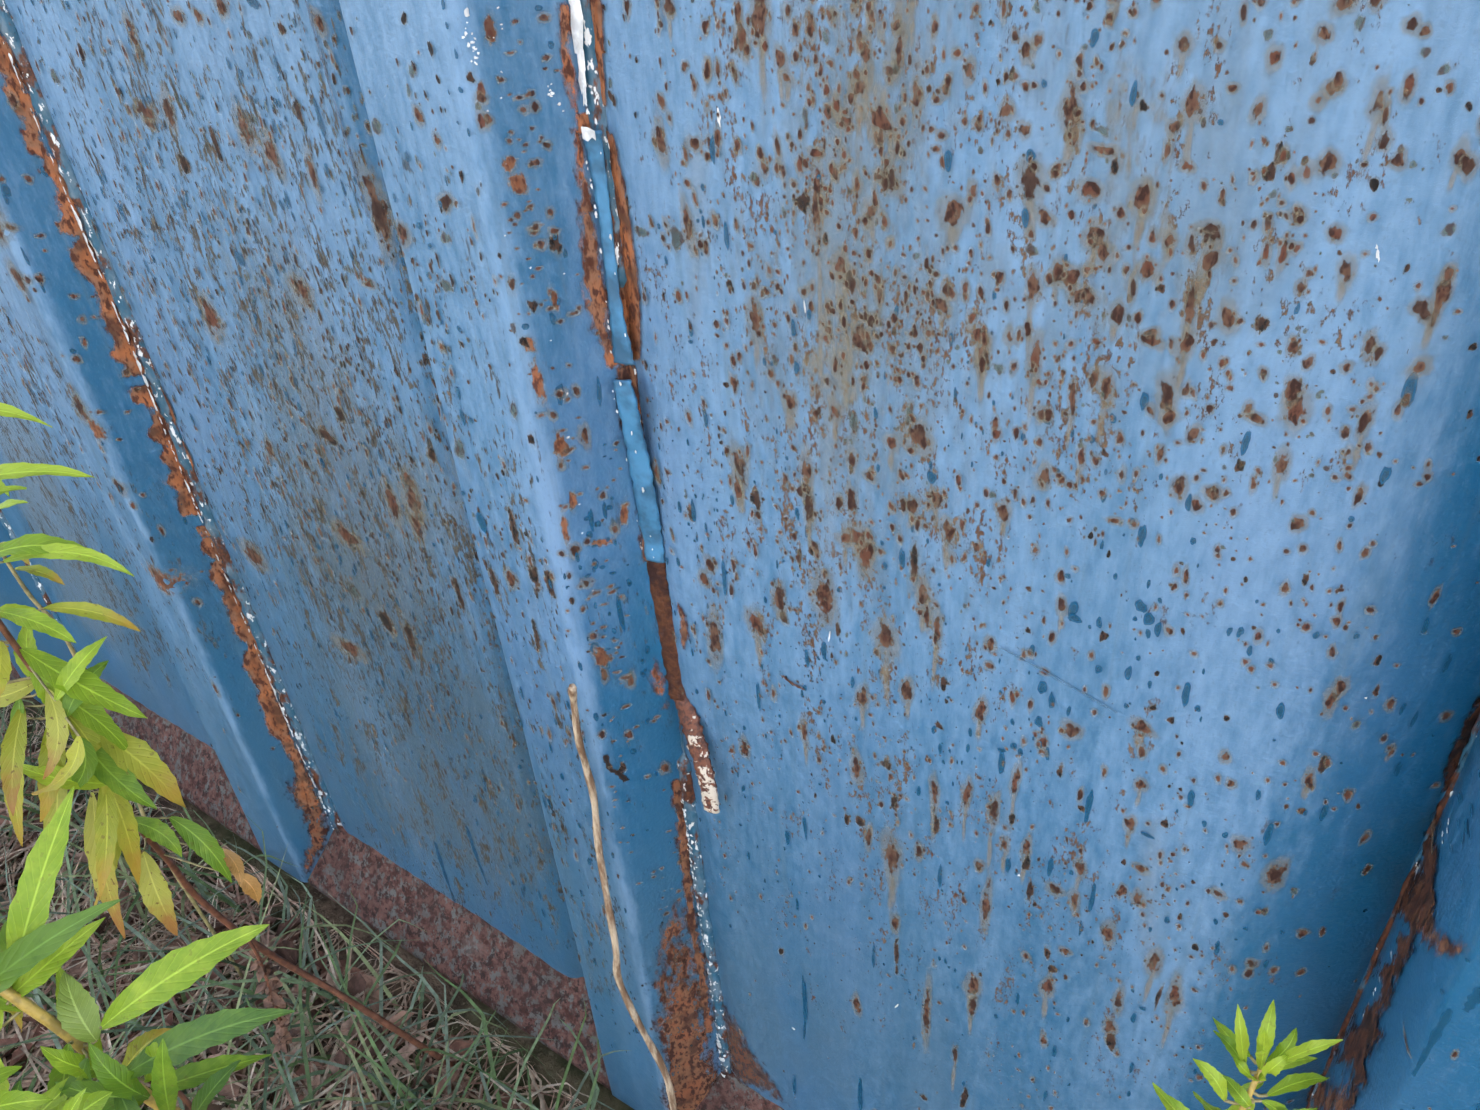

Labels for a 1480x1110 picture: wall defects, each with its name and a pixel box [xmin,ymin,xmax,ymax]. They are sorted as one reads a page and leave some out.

rust [0,0,737,986]
peeling [568,0,726,1078]
rust [476,0,1424,1110]
rust [1406,16,1431,36]
rust [1407,253,1461,373]
rust [1437,148,1476,185]
rust [1287,698,1480,1110]